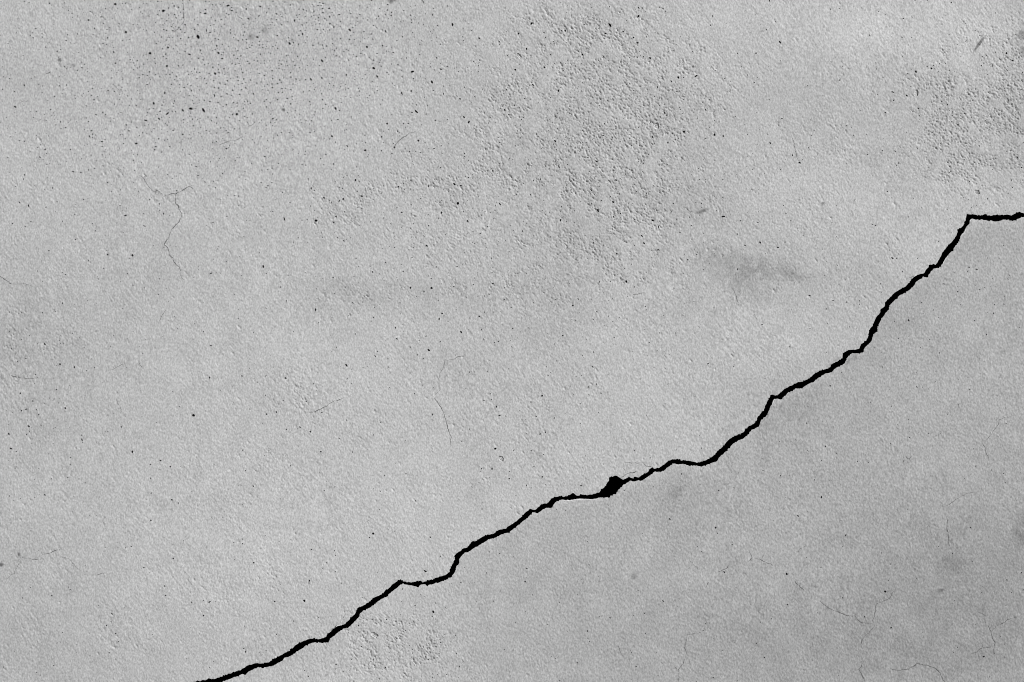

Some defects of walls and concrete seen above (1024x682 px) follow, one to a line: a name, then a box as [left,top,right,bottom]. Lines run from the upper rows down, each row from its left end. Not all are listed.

crack [196,212,1024,682]